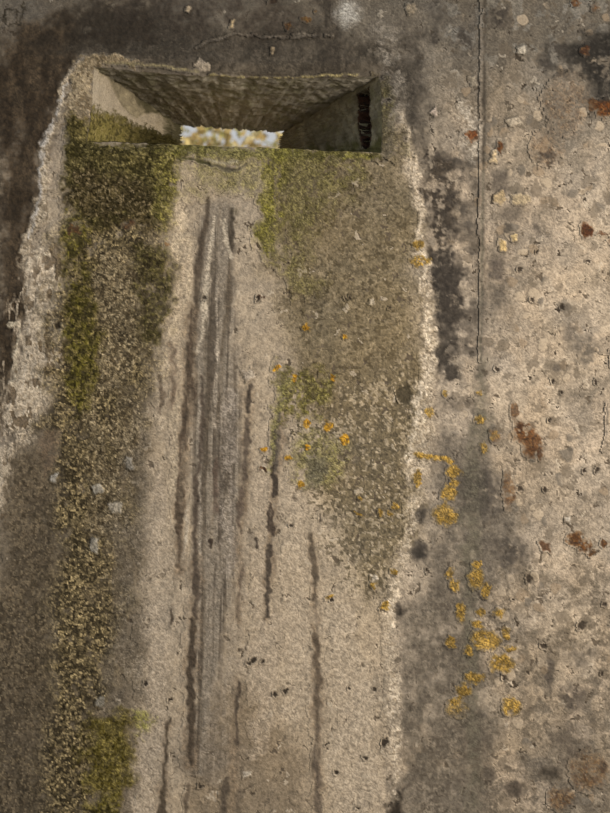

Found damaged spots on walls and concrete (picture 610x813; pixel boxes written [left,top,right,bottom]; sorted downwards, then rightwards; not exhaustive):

damp [17,0,362,79]
crack [103,30,360,78]
damp [534,5,610,100]
rust [528,68,610,170]
damp [0,0,83,469]
damp [551,298,610,375]
damp [123,0,539,813]
rust [488,401,545,462]
rust [564,529,609,558]
damp [535,641,606,784]